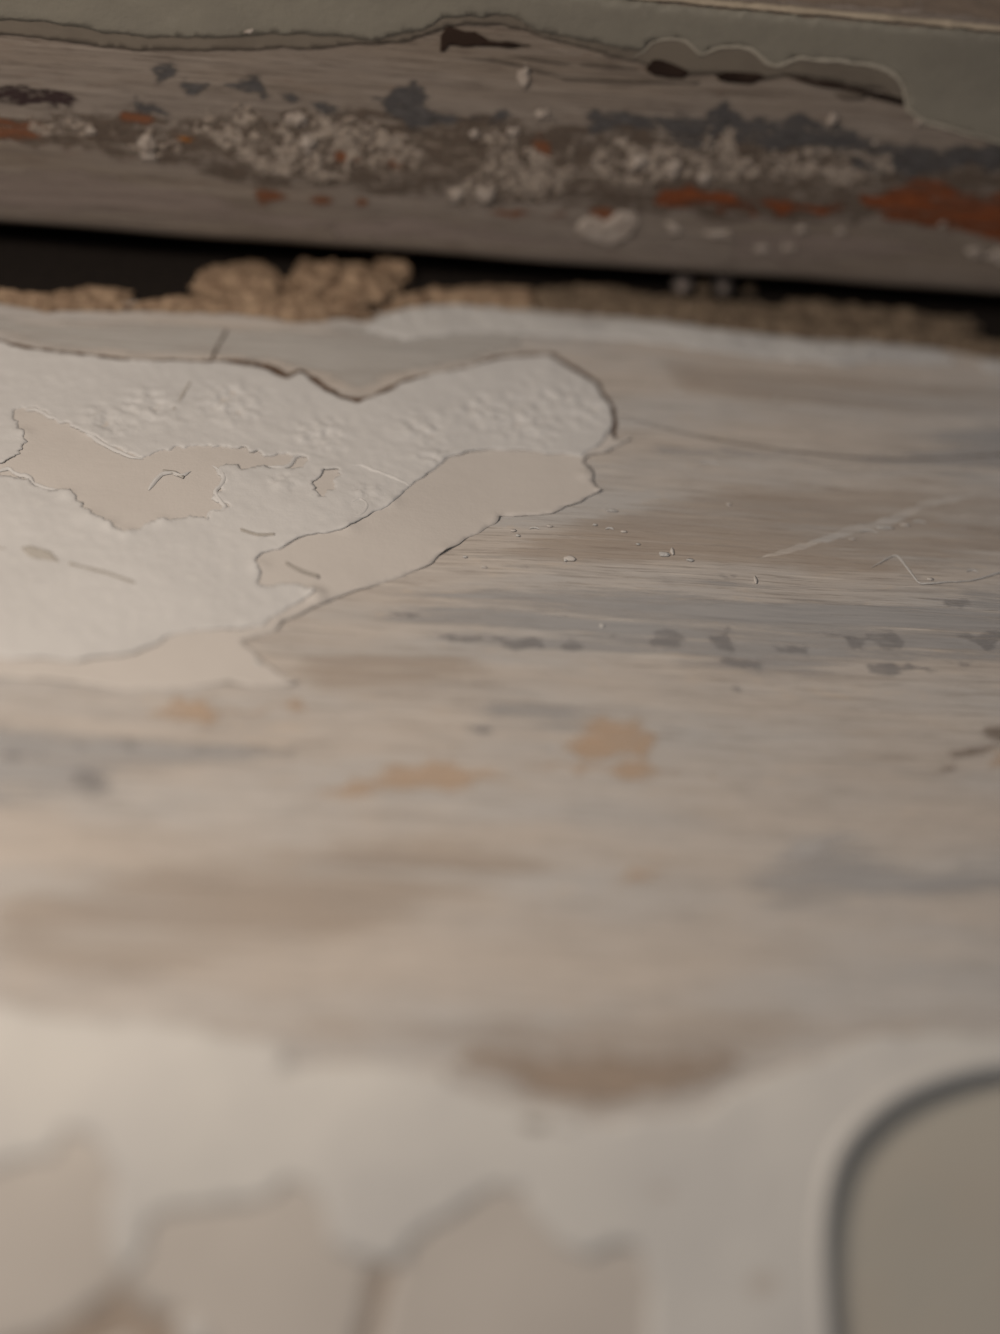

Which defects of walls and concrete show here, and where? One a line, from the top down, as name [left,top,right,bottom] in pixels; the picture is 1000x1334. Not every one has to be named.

peeling [0,0,1000,145]
spalling [0,257,1000,359]
peeling [0,340,630,691]